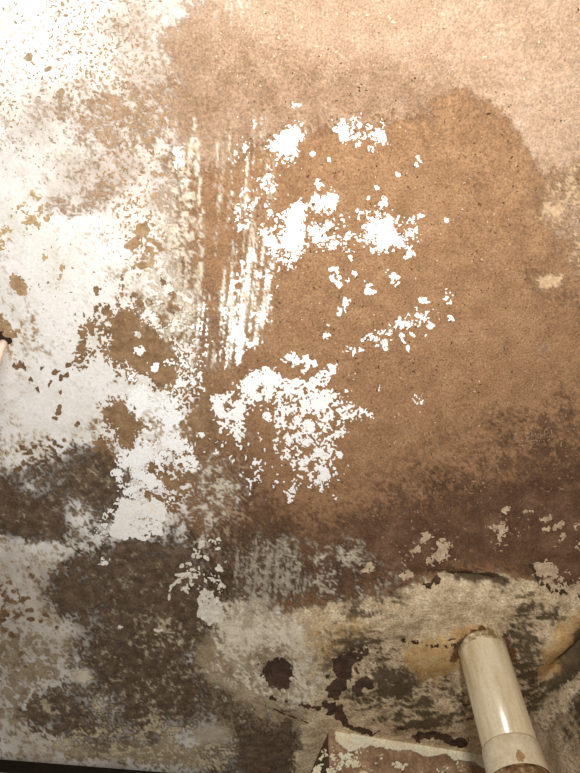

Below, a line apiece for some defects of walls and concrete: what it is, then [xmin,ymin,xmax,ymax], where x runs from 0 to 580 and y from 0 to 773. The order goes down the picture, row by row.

peeling [331,112,388,153]
peeling [0,189,61,252]
leakage [53,178,114,216]
peeling [0,309,43,353]
peeling [9,120,435,544]
leakage [0,444,131,544]
leakage [231,576,248,596]
leakage [347,601,378,620]
leakage [21,669,118,752]
leakage [318,623,474,730]
leakage [506,592,580,773]